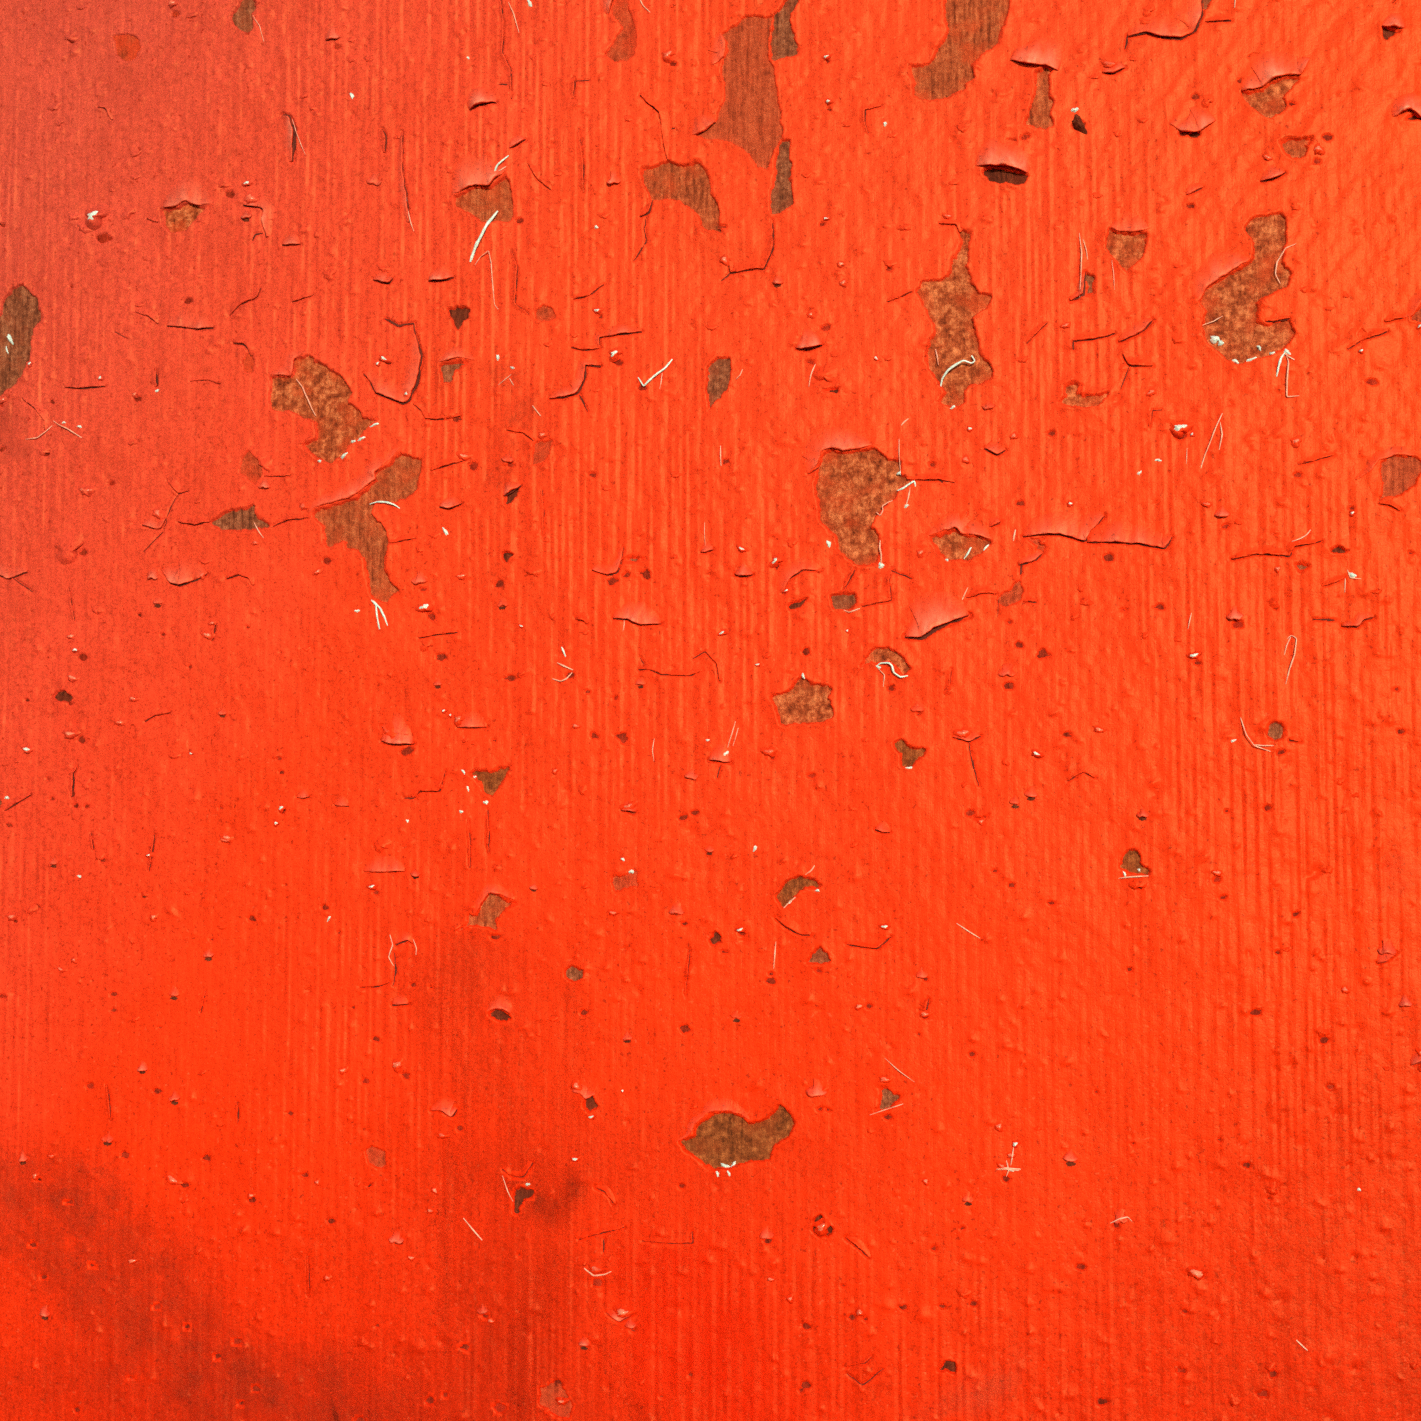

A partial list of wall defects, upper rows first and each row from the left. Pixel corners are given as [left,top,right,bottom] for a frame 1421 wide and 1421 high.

peeling [691,0,798,214]
peeling [912,0,1009,100]
peeling [451,150,523,223]
peeling [643,163,726,233]
peeling [0,286,41,407]
peeling [243,348,379,463]
peeling [917,231,993,409]
peeling [1190,215,1295,364]
peeling [309,446,421,602]
peeling [803,426,910,569]
peeling [773,673,833,725]
peeling [675,1098,794,1177]